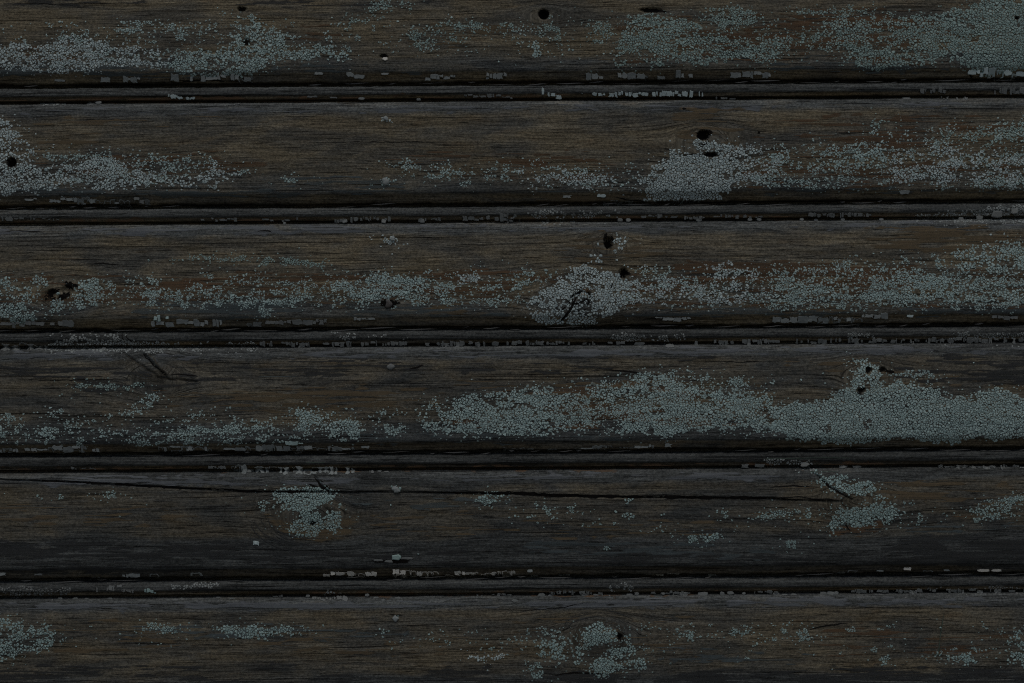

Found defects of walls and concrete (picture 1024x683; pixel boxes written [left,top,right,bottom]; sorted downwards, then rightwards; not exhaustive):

peeling [0,0,1024,100]
peeling [0,107,1024,454]
crack [27,334,198,382]
crack [10,477,380,500]
peeling [208,464,359,540]
peeling [465,486,635,528]
peeling [640,457,1024,554]
peeling [323,553,533,578]
peeling [0,614,77,666]
peeling [134,618,324,646]
peeling [375,620,832,682]
peeling [920,621,1024,668]